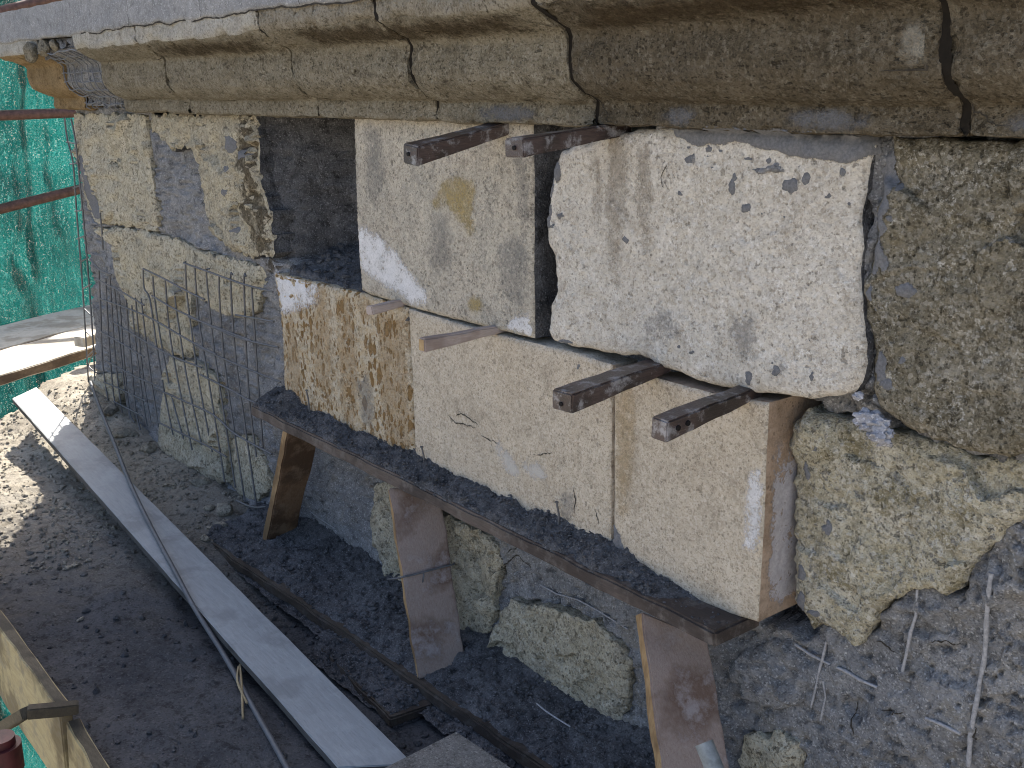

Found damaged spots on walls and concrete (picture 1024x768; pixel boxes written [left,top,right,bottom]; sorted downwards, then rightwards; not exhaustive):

crack [81,0,439,115]
crack [513,0,610,124]
crack [884,0,1005,137]
water stain [235,118,319,314]
water stain [358,228,427,306]
crack [448,411,499,445]